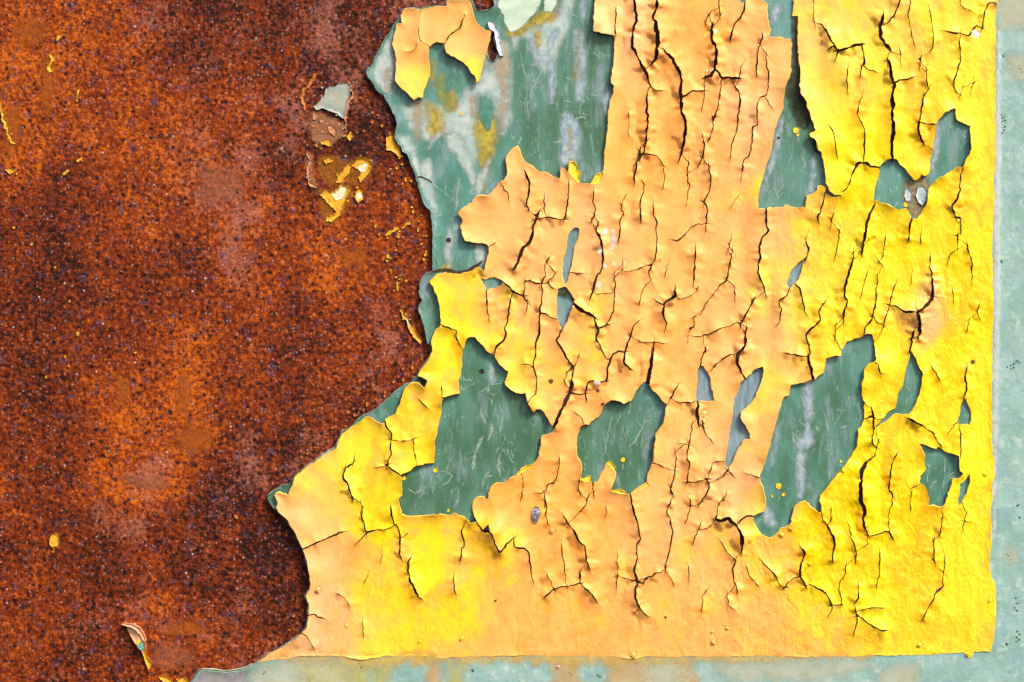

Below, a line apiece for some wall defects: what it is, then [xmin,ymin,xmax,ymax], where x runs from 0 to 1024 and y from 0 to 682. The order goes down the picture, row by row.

corrosion [473,0,494,11]
corrosion [0,0,456,682]
crack [303,421,421,599]
crack [432,244,493,274]
peeling [398,337,556,534]
peeling [368,0,616,345]
peeling [576,382,667,495]
crack [453,0,990,634]
peeling [758,0,843,209]
peeling [753,333,923,538]
peeling [874,108,972,219]
peeling [920,444,970,507]